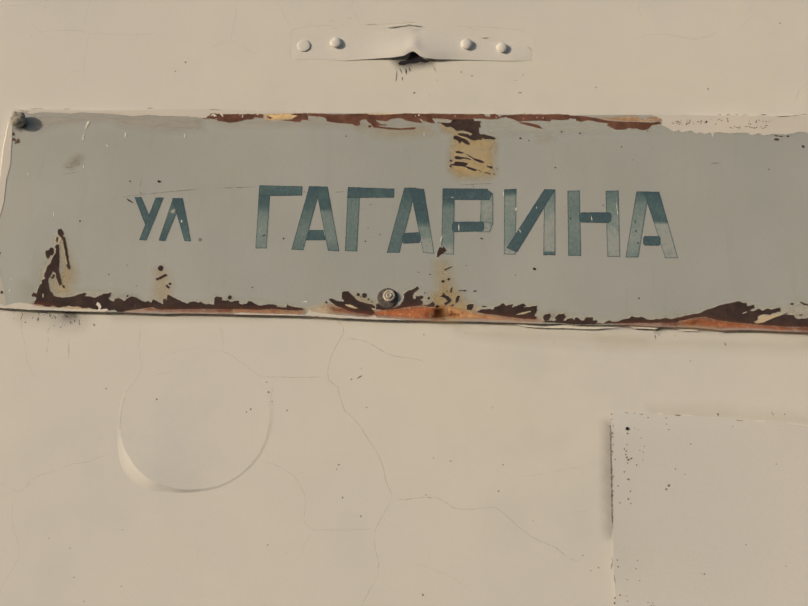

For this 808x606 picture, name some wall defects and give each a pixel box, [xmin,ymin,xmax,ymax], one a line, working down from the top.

crack [607,434,615,523]